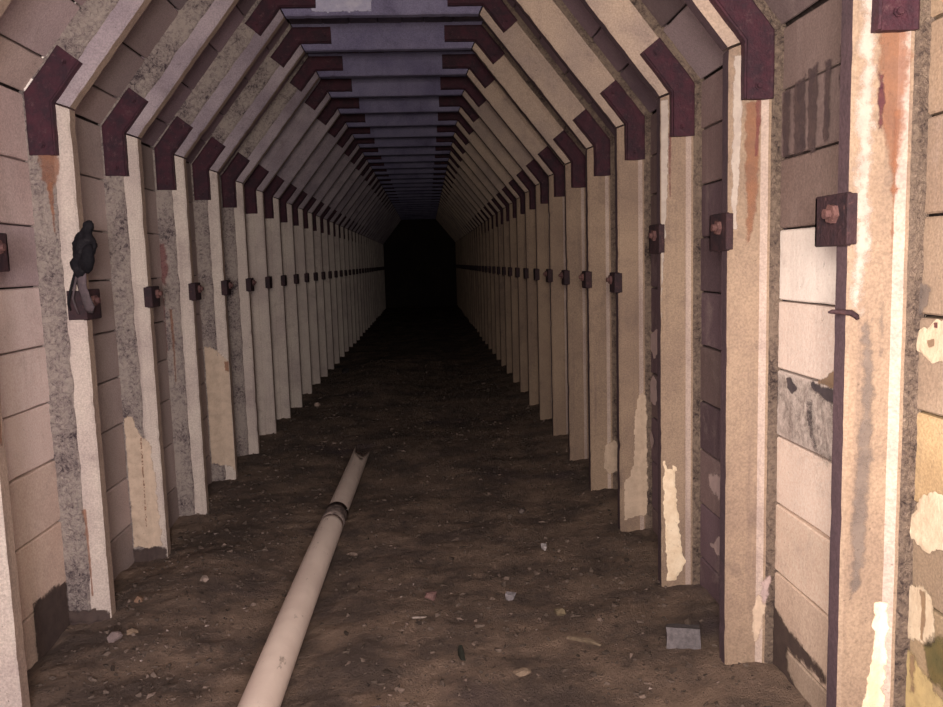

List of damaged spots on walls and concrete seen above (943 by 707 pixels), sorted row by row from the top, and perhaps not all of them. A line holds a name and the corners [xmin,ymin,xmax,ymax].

rust [38,155,59,232]
rust [745,102,760,241]
leakage [782,45,841,157]
rust [878,32,909,201]
peeling [916,319,943,363]
peeling [624,376,657,520]
leakage [781,371,834,461]
peeling [662,461,686,581]
peeling [910,491,943,554]
leakage [773,605,826,686]
peeling [862,602,890,707]
peeling [906,585,943,707]